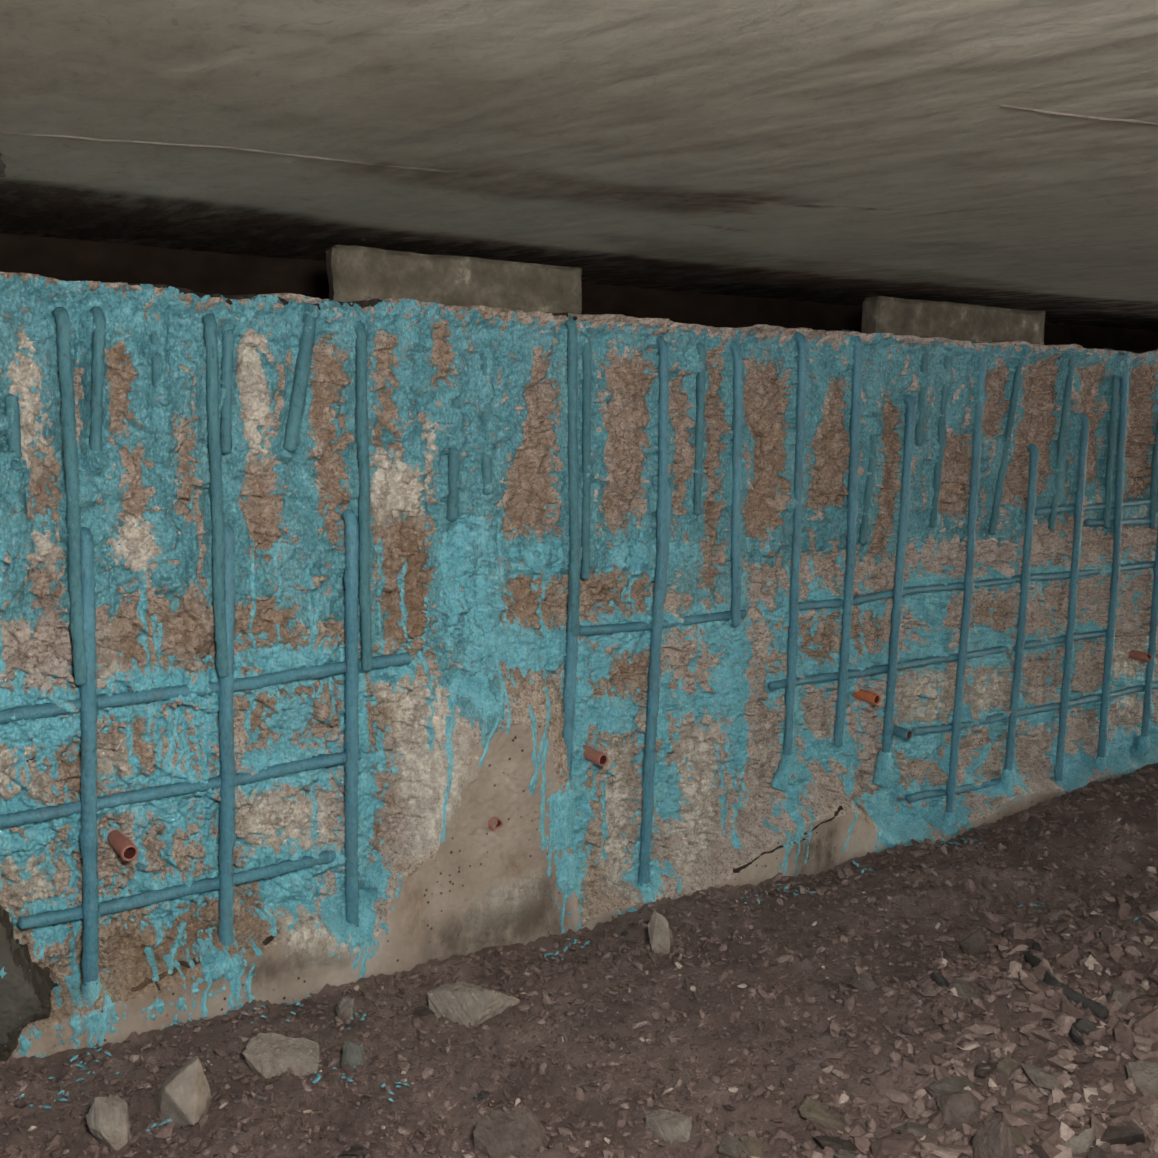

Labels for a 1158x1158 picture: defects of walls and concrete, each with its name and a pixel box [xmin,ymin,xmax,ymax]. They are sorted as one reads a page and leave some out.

spalling [0,272,1158,1057]
crack [733,805,843,873]